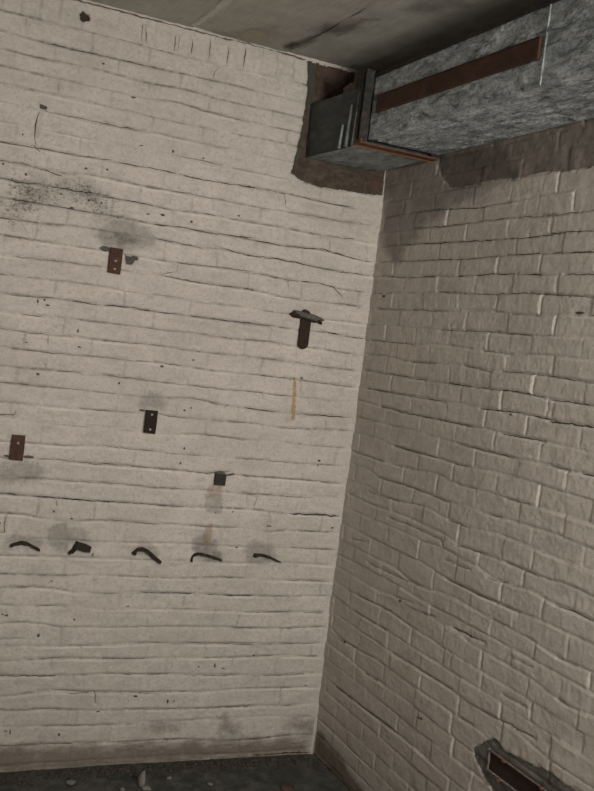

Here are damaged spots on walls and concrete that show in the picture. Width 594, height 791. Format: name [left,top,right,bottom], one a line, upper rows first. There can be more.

flaking render [291,61,385,195]
spalling [473,737,576,791]